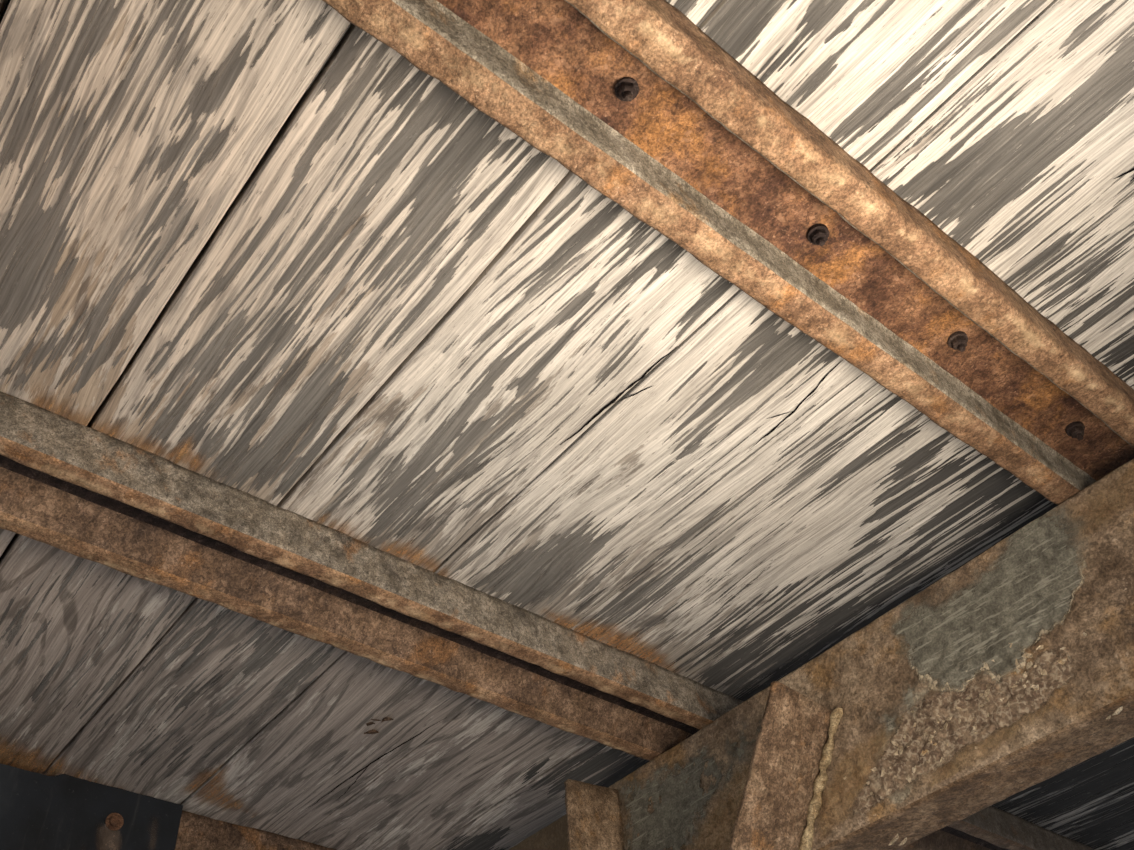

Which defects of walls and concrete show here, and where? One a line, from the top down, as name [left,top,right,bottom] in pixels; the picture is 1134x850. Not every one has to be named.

peeling [442,308,1084,706]
rust [556,618,663,665]
rust [851,643,1075,815]